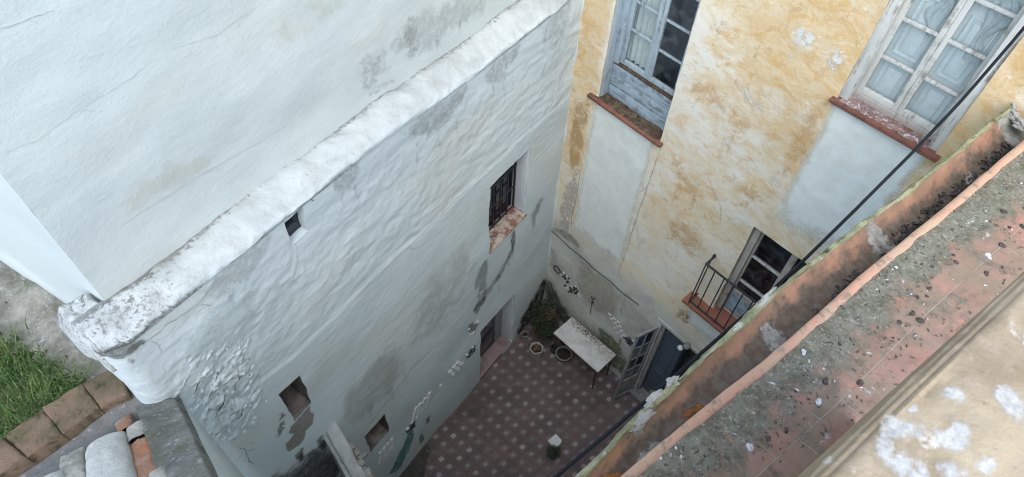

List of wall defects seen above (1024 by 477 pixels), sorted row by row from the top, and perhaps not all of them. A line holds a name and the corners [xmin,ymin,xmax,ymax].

peeling [787,23,819,61]
peeling [828,48,843,71]
crack [146,286,214,353]
peeling [174,336,268,443]
flaking render [276,406,314,460]